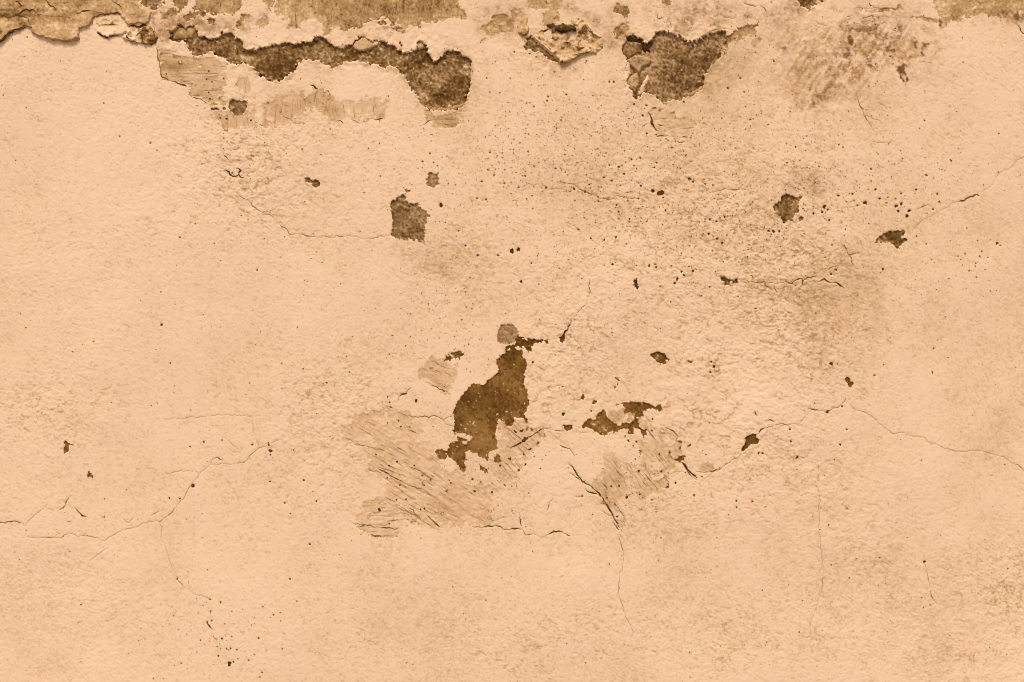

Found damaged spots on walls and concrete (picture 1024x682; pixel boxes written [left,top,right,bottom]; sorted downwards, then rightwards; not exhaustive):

flaking render [0,0,472,131]
flaking render [479,0,762,141]
flaking render [390,189,443,244]
flaking render [767,194,830,233]
flaking render [875,193,927,249]
crack [0,414,284,641]
peeling [340,324,565,539]
peeling [562,394,714,530]
crack [755,399,1023,470]